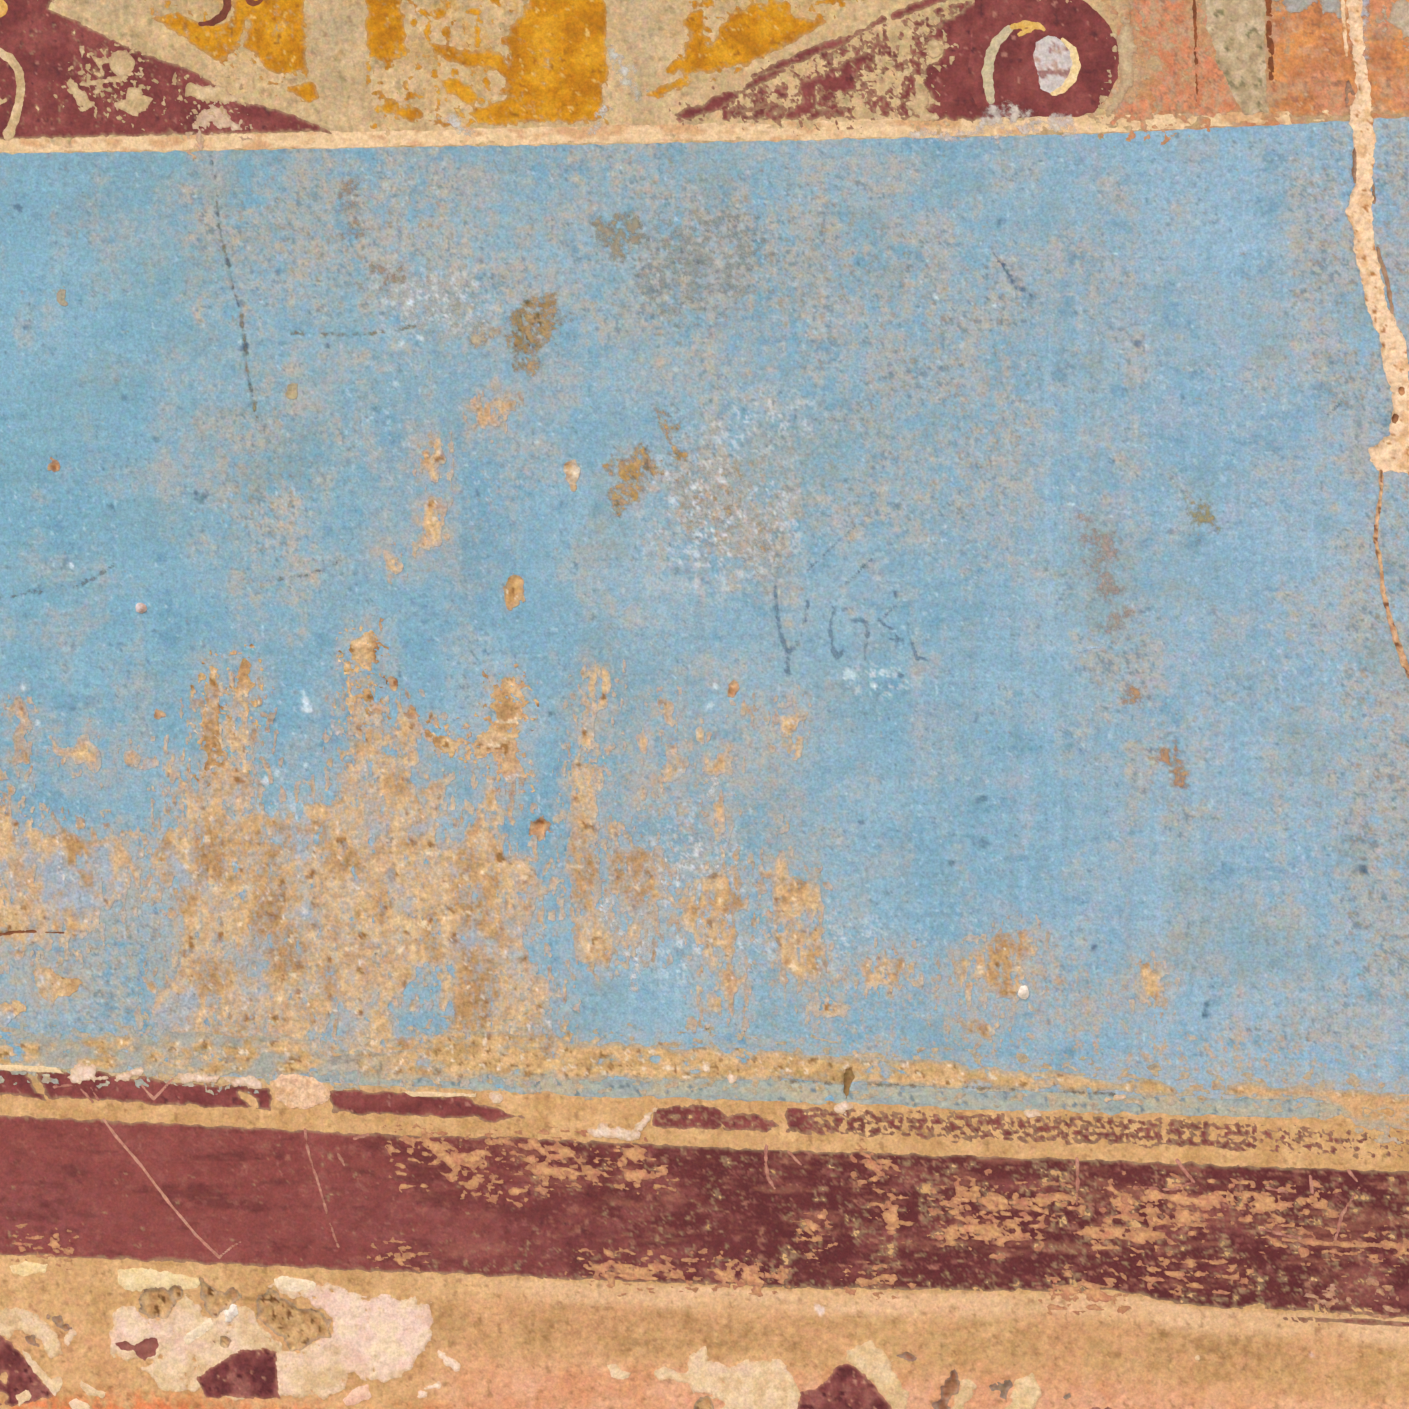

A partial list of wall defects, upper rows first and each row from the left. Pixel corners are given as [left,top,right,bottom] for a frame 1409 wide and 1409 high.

peeling [53,38,258,161]
peeling [894,30,959,135]
peeling [1087,4,1150,128]
crack [1341,0,1409,679]
peeling [0,618,1409,1144]
peeling [10,1261,48,1276]
peeling [0,1307,106,1409]
peeling [109,1268,461,1406]
peeling [607,1364,630,1379]
peeling [654,1346,801,1409]
peeling [846,1340,917,1409]
peeling [932,1369,1042,1409]